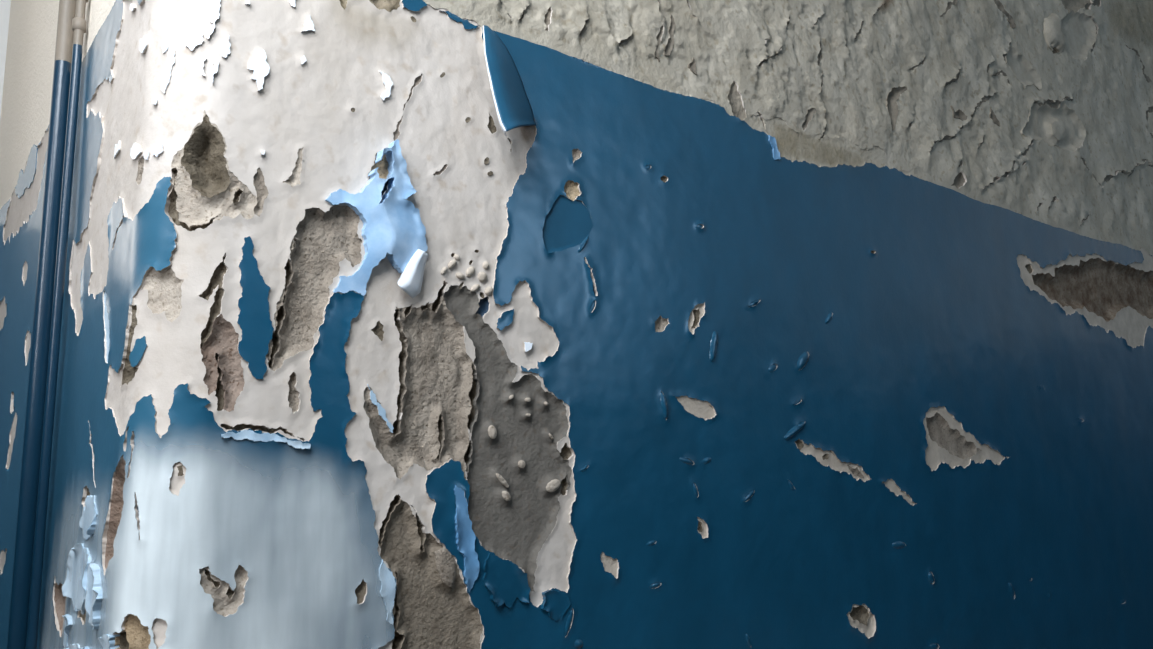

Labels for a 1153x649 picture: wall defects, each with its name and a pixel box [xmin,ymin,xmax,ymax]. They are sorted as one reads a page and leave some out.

crack [787,3,884,87]
crack [1085,0,1100,52]
crack [934,0,1016,167]
crack [1034,97,1073,108]
crack [1081,45,1153,185]
crack [988,140,1033,186]
peeling [54,0,576,649]
flaking render [1017,248,1153,348]
peeling [676,396,715,420]
peeling [923,406,1008,471]
peeling [795,439,916,505]
peeling [847,604,875,638]